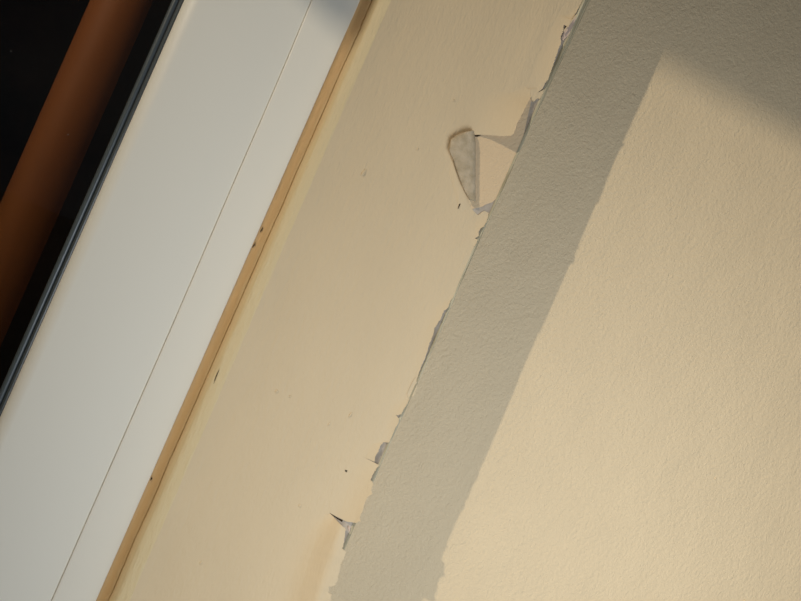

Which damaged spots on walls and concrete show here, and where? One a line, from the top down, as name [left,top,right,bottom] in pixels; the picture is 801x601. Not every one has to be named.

peeling [449,5,579,246]
peeling [410,296,453,379]
peeling [273,399,409,601]